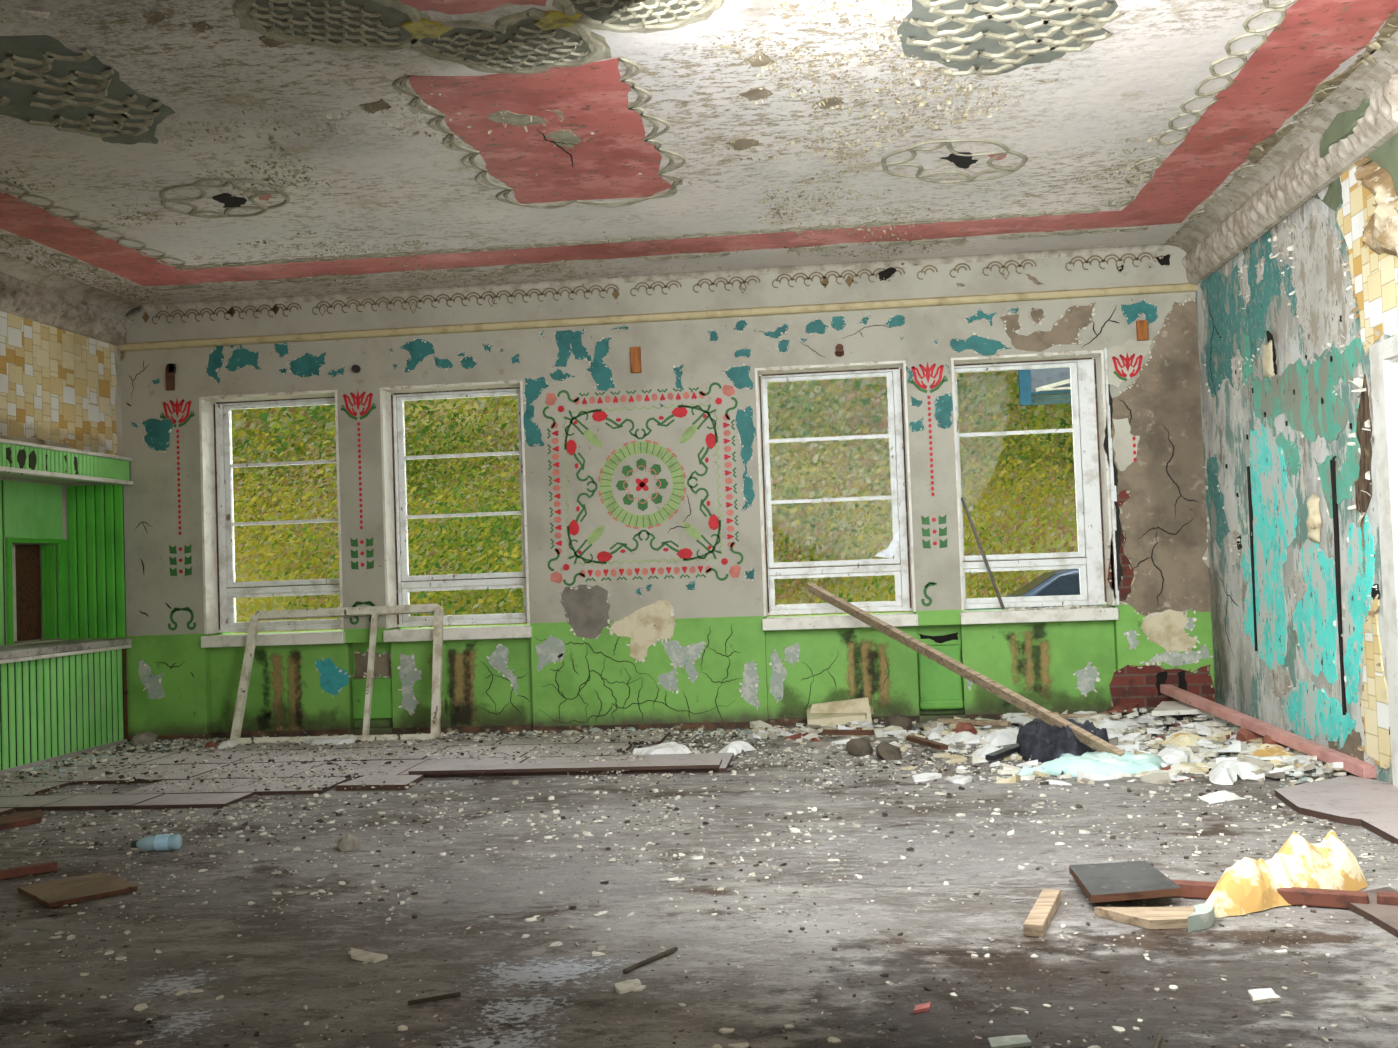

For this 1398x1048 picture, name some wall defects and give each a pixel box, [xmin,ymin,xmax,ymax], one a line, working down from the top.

peeling [711,0,1059,281]
peeling [1154,10,1398,267]
peeling [389,326,631,447]
peeling [906,364,958,432]
crack [1103,385,1199,607]
flaking render [934,177,1381,762]
flaking render [314,648,422,715]
crack [481,626,741,724]
flaking render [535,583,706,694]
crack [800,656,838,710]
leakage [854,647,879,697]
leakage [1018,624,1045,691]